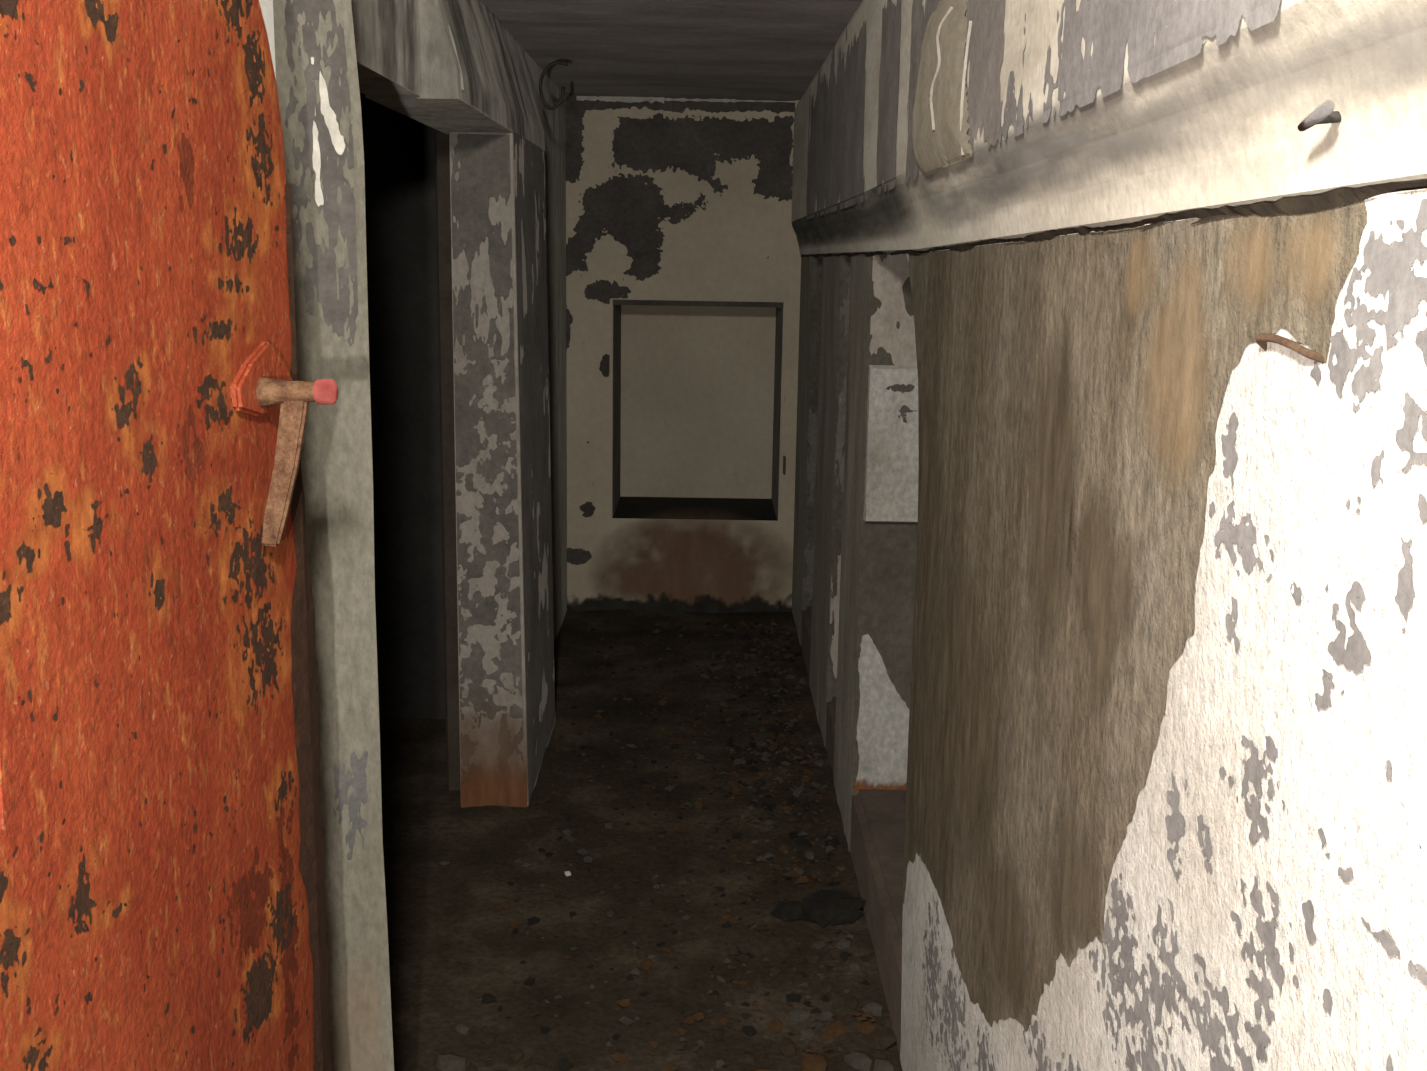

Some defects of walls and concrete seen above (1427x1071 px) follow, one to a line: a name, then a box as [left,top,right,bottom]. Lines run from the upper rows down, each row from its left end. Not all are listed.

corrosion [192,0,285,294]
peeling [565,0,941,304]
peeling [965,0,1281,155]
corrosion [0,473,112,625]
corrosion [184,485,285,748]
peeling [451,131,592,801]
damp [567,593,792,613]
peeling [830,555,841,679]
spalling [855,198,1427,1071]
corrosion [0,926,53,1071]
corrosion [48,845,127,938]
corrosion [175,770,313,1071]